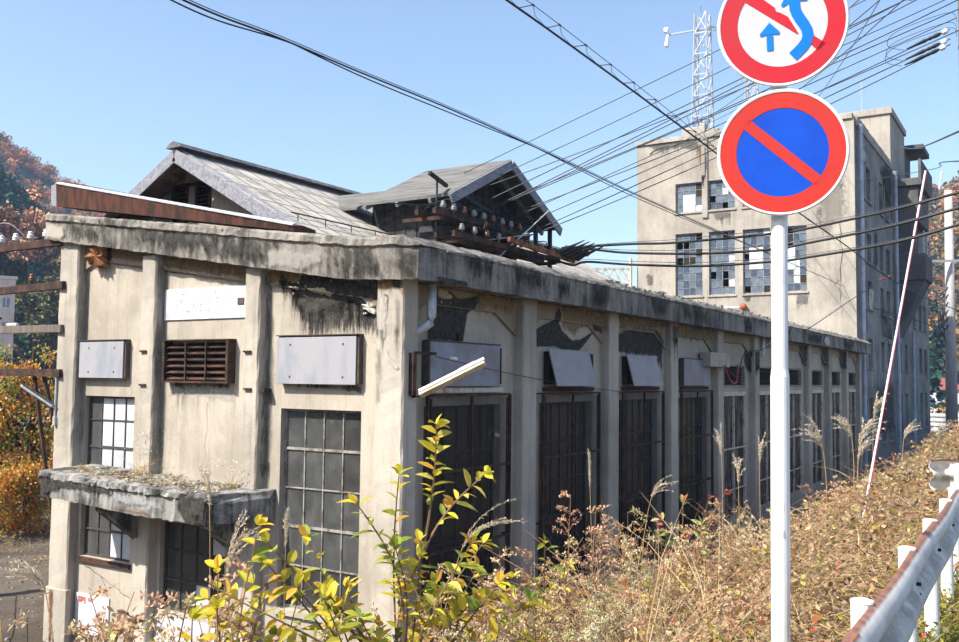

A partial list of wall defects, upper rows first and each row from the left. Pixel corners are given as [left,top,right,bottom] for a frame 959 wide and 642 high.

peeling [289,277,332,297]
peeling [361,302,377,315]
leakage [428,277,515,341]
leakage [515,265,610,350]
leakage [40,477,163,511]
leakage [177,495,205,523]